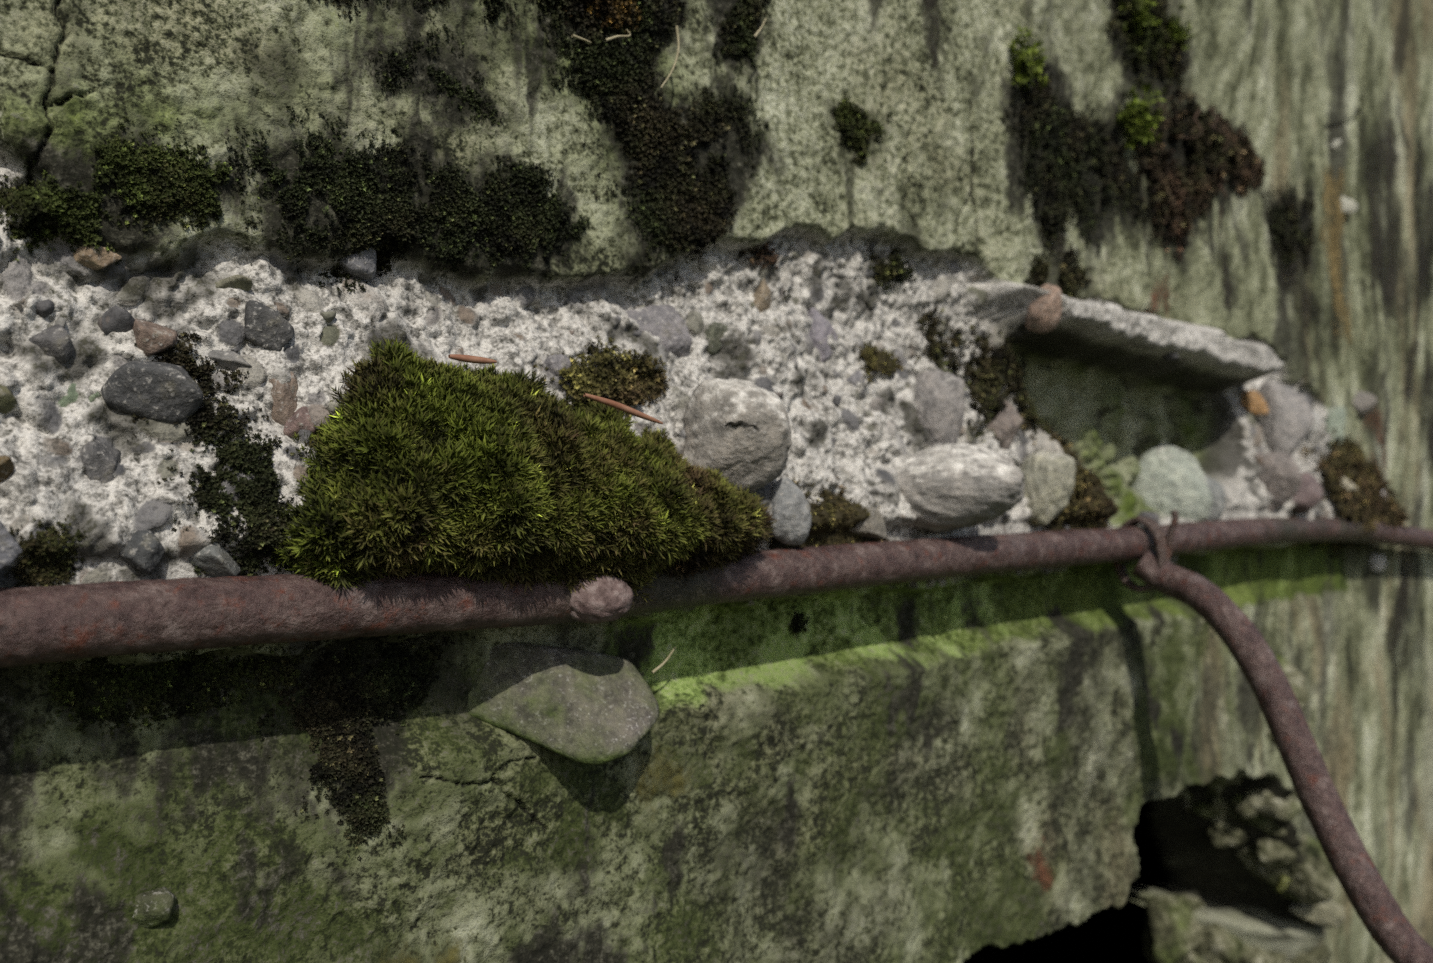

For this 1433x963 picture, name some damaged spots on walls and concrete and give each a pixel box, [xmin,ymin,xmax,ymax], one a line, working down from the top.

crack [4,0,83,186]
spalling [0,140,1348,588]
corrosion [622,516,1433,616]
spalling [121,632,430,665]
corrosion [0,571,579,668]